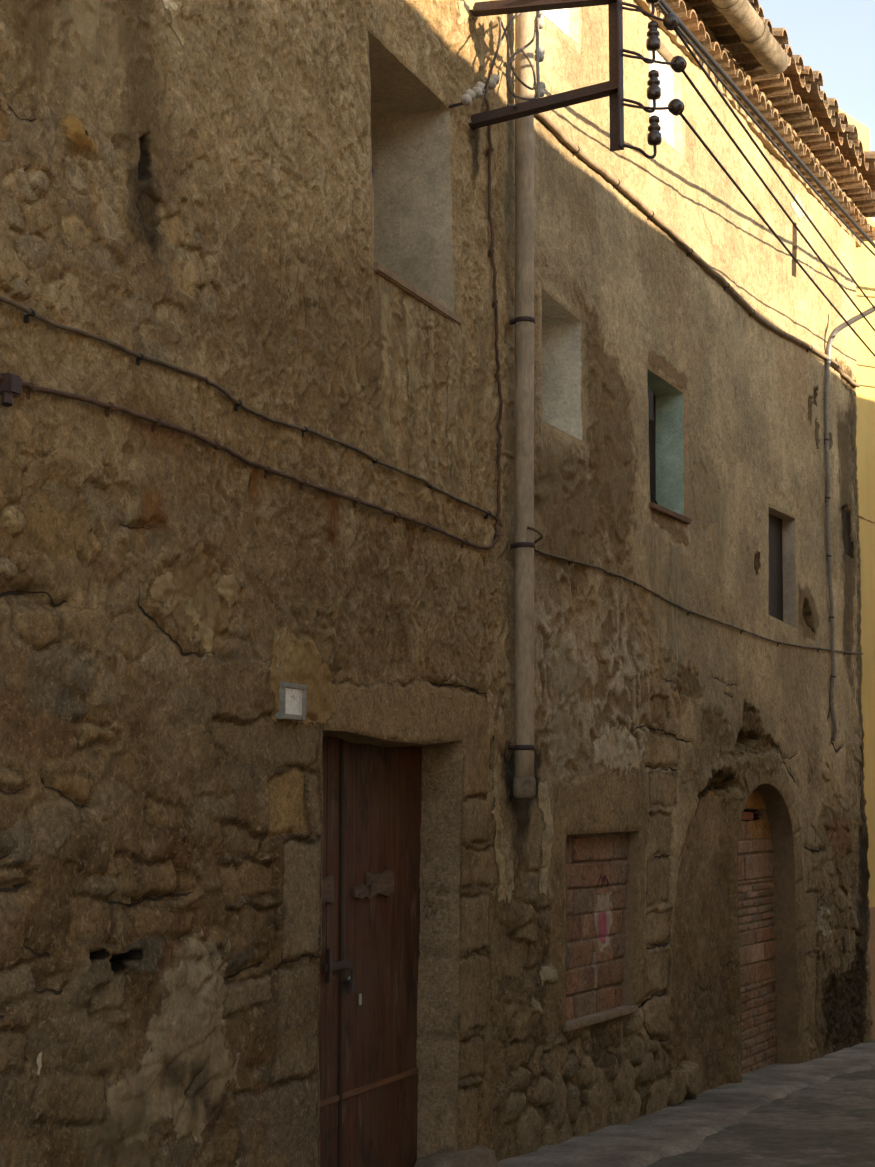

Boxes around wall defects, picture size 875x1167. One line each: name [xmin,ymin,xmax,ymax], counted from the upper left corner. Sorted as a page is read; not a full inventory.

flaking render [162,0,186,46]
spalling [134,136,160,249]
crack [0,589,67,607]
spalling [798,585,819,639]
crack [630,725,691,771]
spalling [675,655,780,821]
water stain [821,837,870,1052]
flaking render [82,929,241,1167]